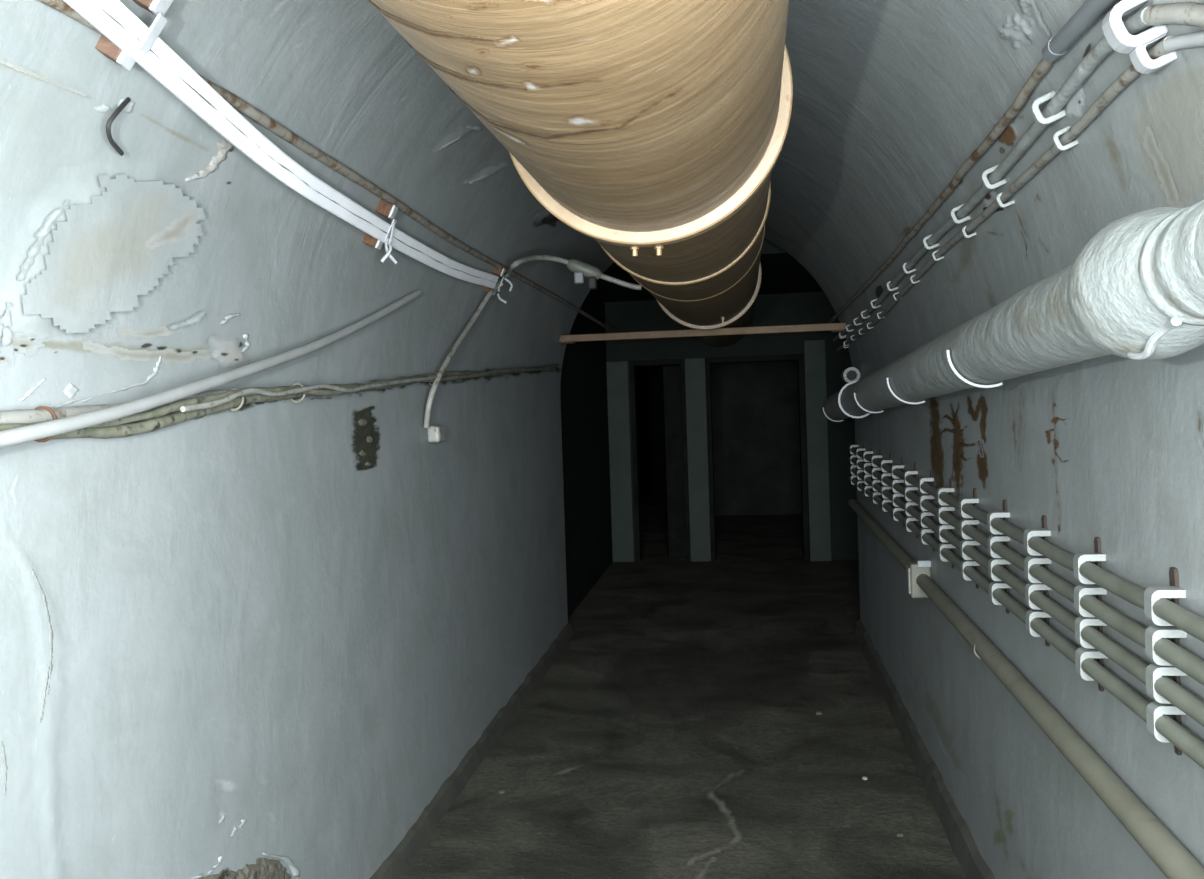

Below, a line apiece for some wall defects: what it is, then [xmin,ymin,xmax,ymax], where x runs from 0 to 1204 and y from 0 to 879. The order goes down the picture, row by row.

spalling [353,406,380,470]
corrosion [928,392,990,506]
spalling [191,853,300,879]